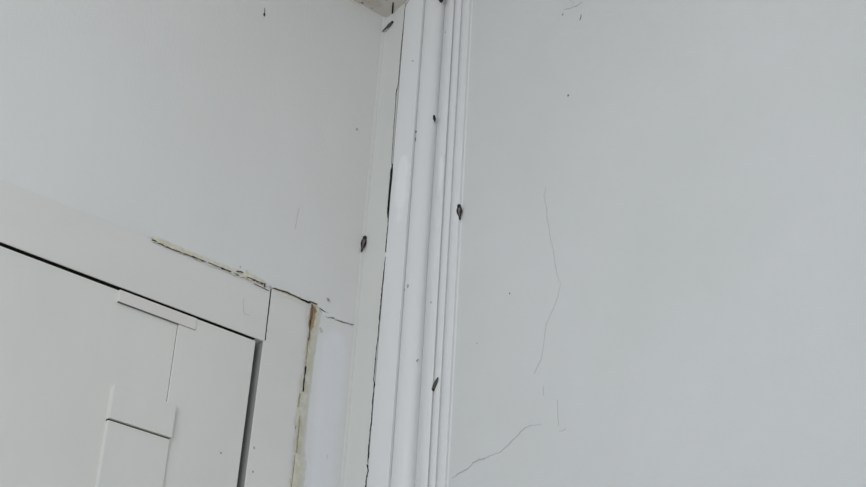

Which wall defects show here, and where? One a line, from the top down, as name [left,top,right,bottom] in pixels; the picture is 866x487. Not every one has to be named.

crack [454,188,565,477]